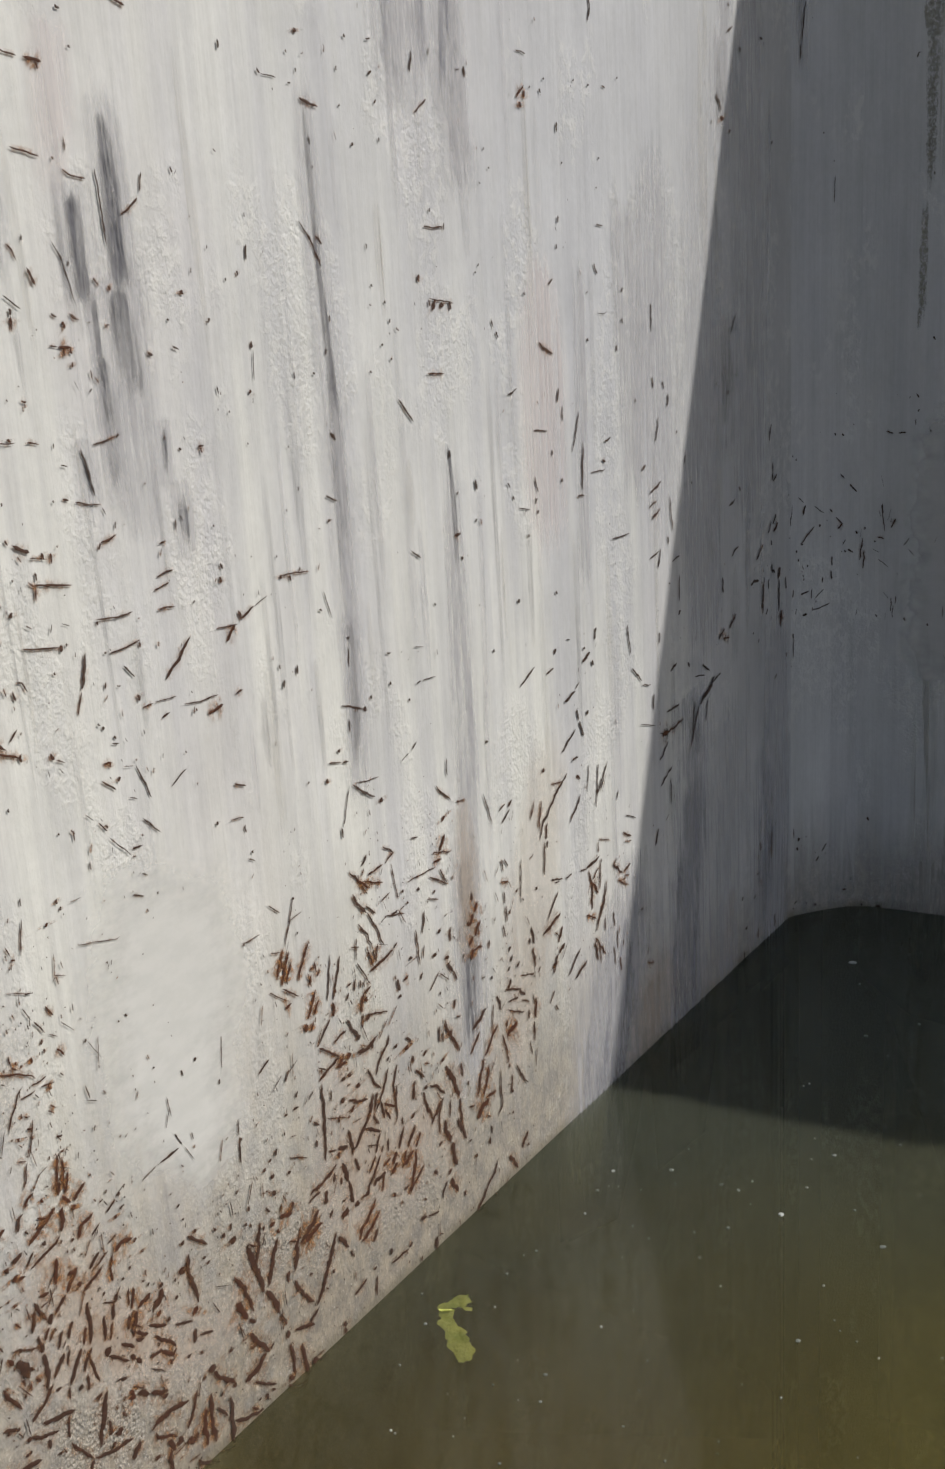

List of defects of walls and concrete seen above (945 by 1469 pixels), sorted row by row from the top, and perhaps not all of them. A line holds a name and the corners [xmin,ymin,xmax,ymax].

damp [65,115,143,484]
corrosion [4,541,70,599]
damp [179,503,190,538]
corrosion [217,555,319,641]
corrosion [751,497,896,679]
corrosion [0,624,721,1469]